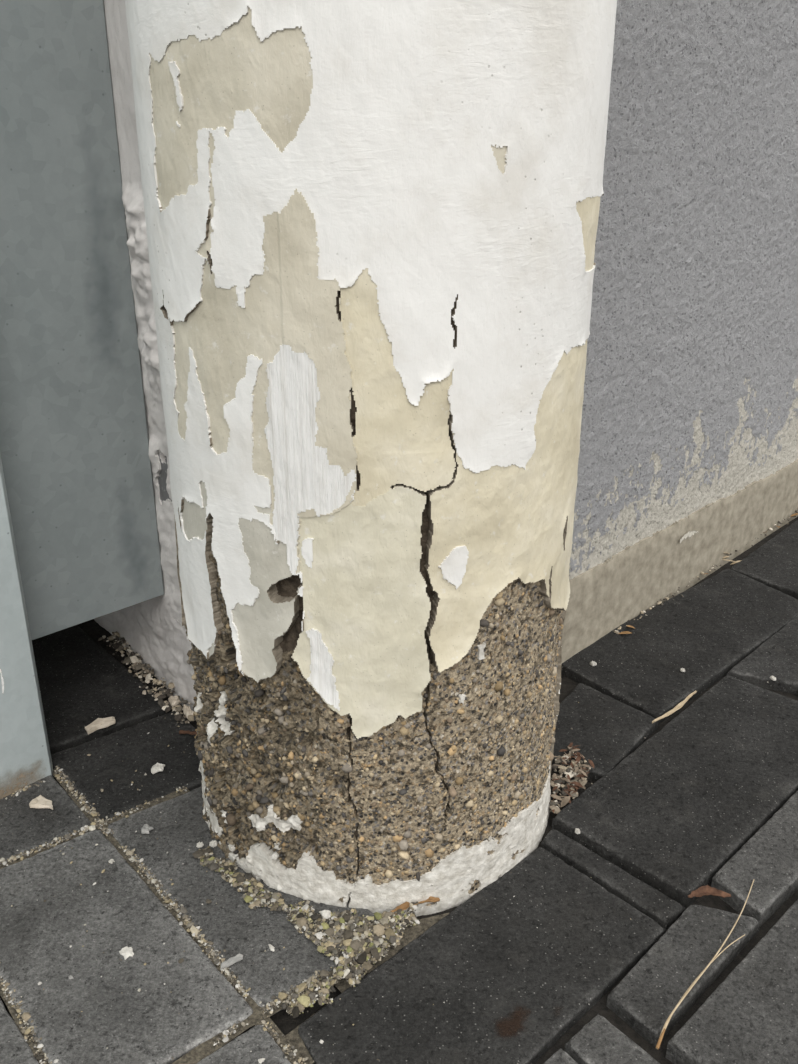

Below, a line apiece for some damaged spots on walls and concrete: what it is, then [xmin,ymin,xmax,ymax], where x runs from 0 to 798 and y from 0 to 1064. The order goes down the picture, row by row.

crack [334,291,342,320]
crack [349,388,357,435]
crack [355,465,363,489]
spalling [149,6,798,917]
crack [420,492,448,817]
crack [347,716,359,900]